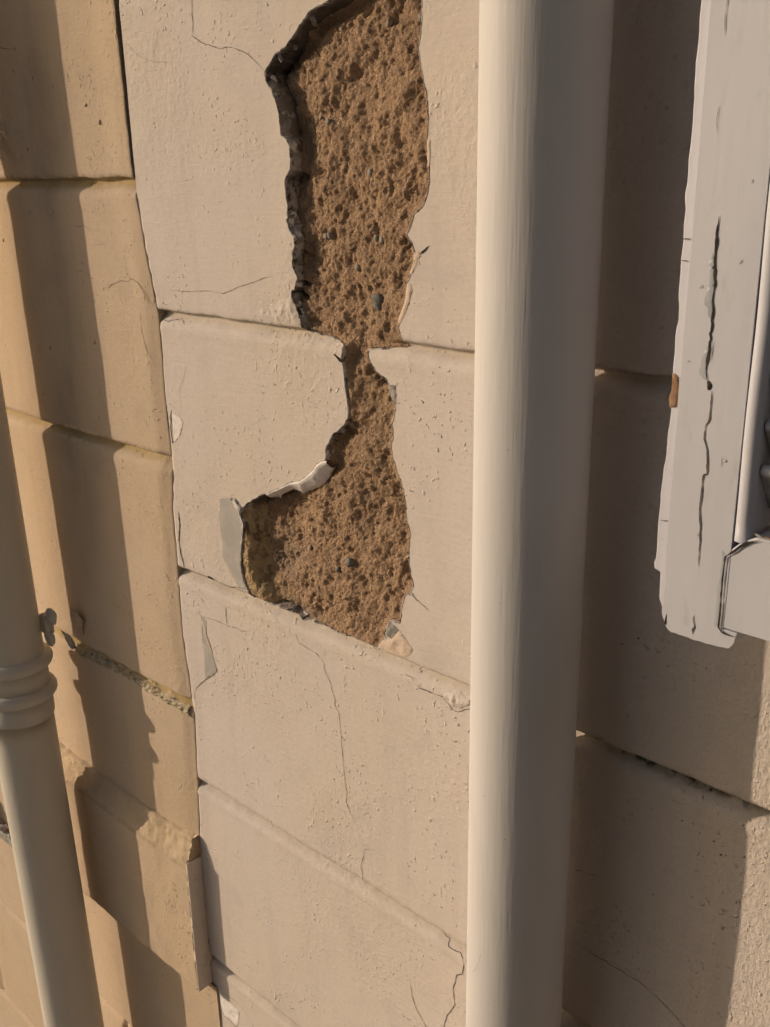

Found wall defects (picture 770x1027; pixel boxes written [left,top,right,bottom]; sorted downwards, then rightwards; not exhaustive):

crack [191,13,261,67]
spalling [219,0,431,657]
crack [409,933,465,1027]